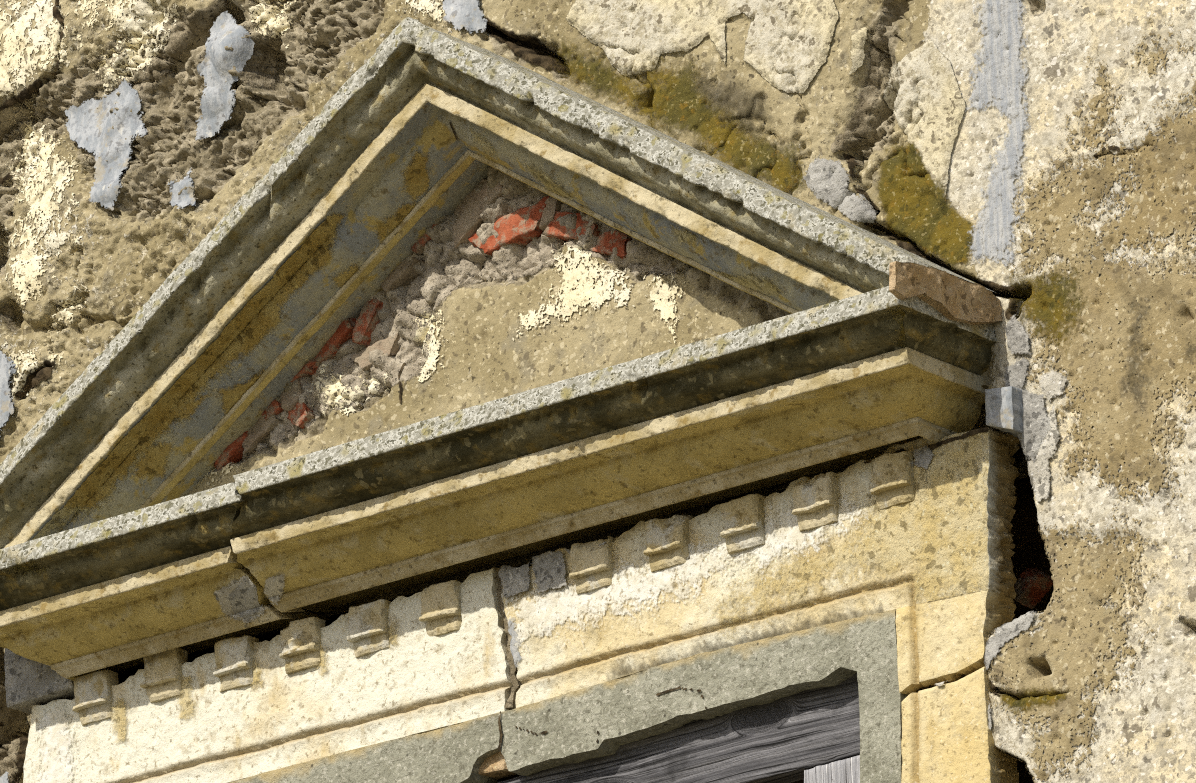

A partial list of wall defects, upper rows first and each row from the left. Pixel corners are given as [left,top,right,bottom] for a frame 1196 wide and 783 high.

peeling [395,0,487,33]
peeling [566,0,839,94]
peeling [848,27,868,75]
damp [698,78,767,129]
spalling [205,179,685,489]
peeling [213,574,286,623]
crack [492,567,548,751]
crack [916,674,1016,697]